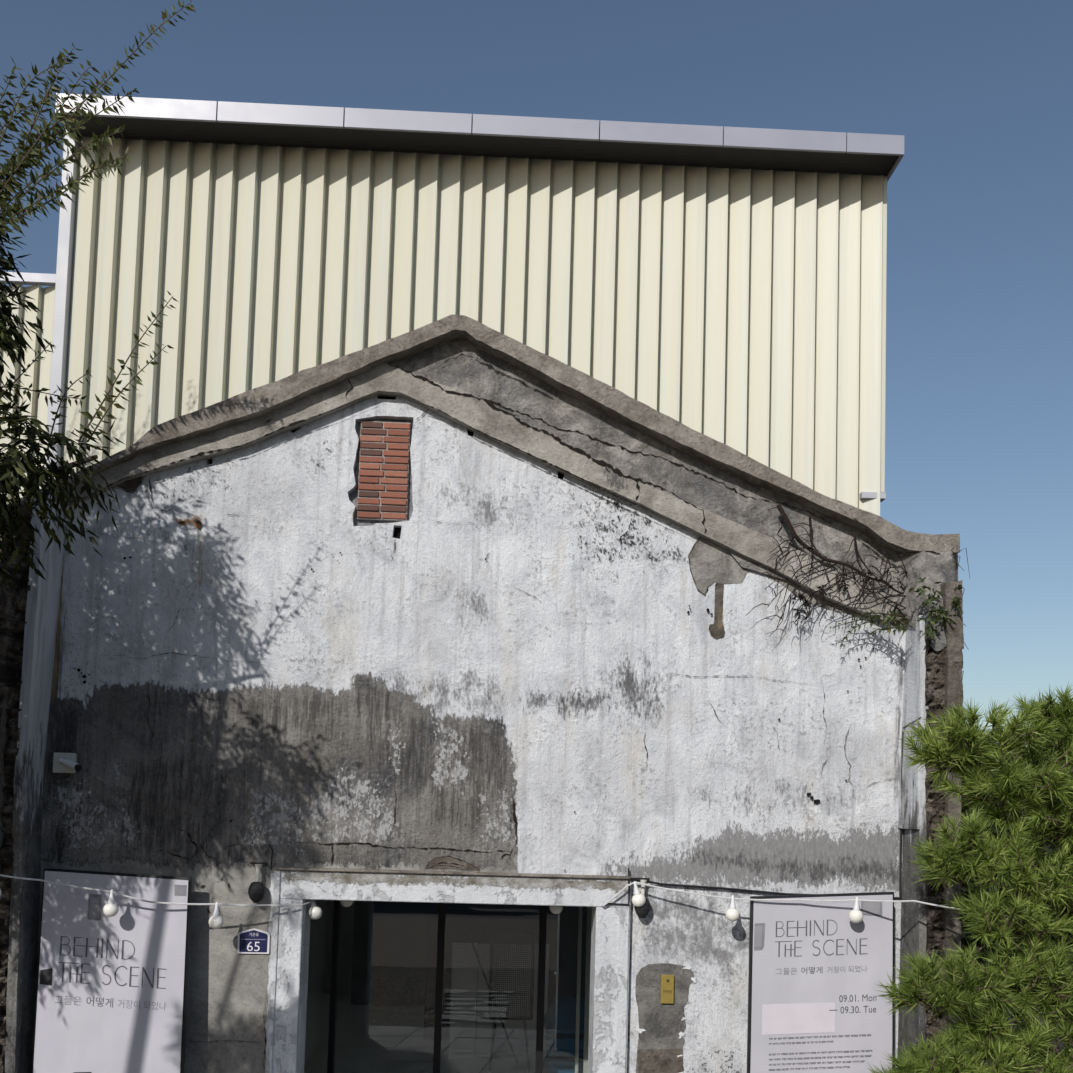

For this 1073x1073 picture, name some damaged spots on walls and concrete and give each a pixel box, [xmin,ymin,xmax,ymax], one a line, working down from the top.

crack [429,330,546,377]
crack [68,379,372,539]
crack [389,364,940,558]
corrosion [178,517,202,530]
leakage [568,466,687,577]
spalling [688,537,751,639]
peeling [766,575,868,618]
leakage [600,820,903,895]
peeling [634,888,749,1073]